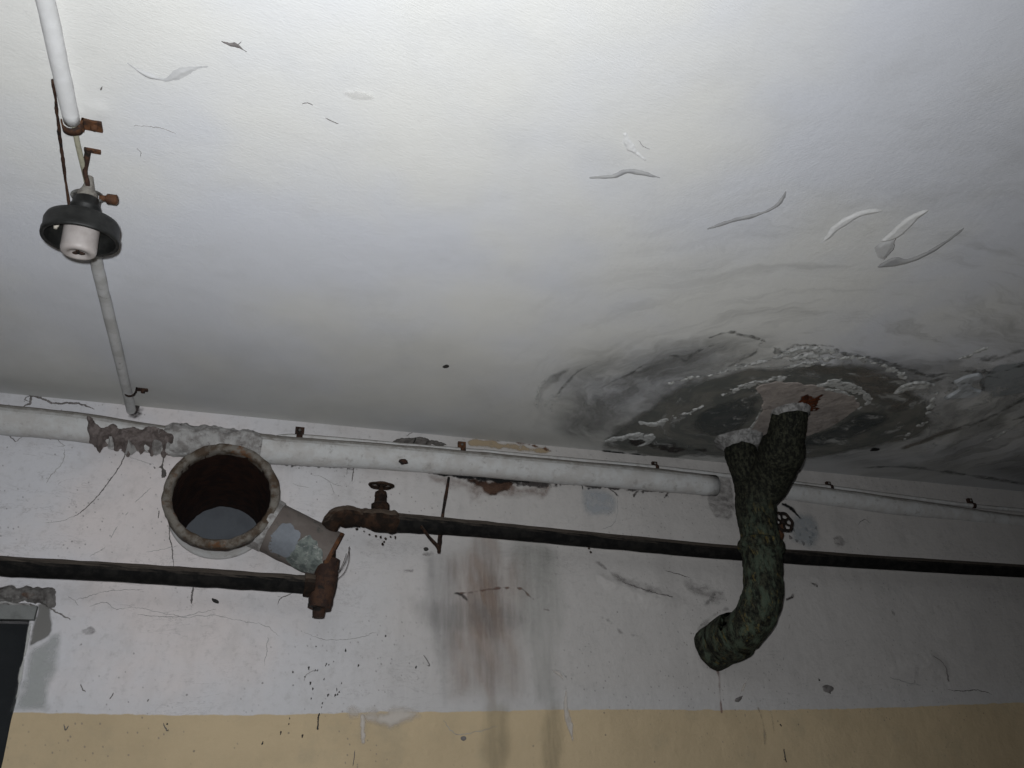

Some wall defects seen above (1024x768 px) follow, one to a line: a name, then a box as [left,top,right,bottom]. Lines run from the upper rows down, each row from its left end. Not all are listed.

peeling [820,209,884,244]
peeling [874,209,964,268]
leakage [606,345,930,457]
spalling [0,585,56,611]